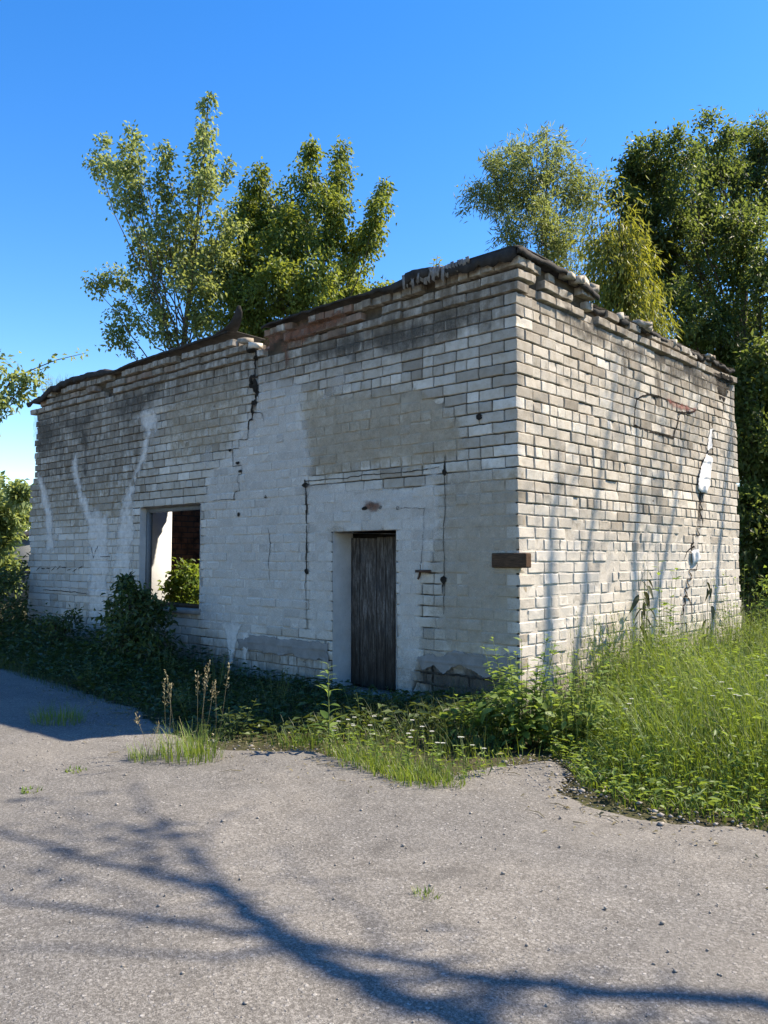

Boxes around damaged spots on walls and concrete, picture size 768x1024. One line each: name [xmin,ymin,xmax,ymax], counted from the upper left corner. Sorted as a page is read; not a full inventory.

leakage [37,422,61,451]
crack [214,347,264,517]
leakage [38,476,55,551]
leakage [72,389,157,627]
peeling [418,650,517,709]